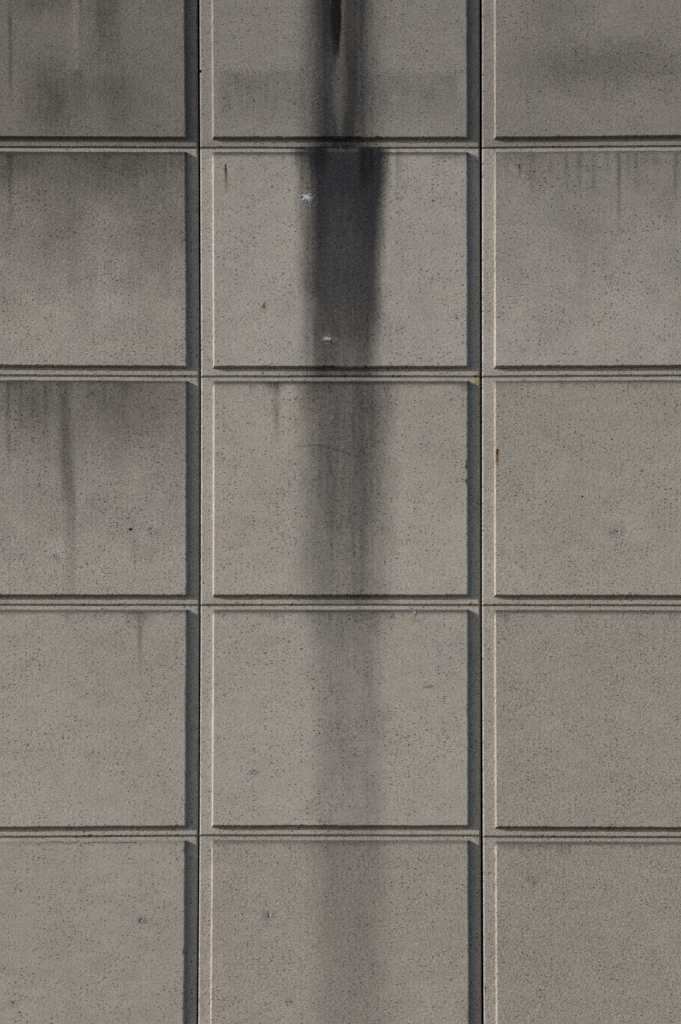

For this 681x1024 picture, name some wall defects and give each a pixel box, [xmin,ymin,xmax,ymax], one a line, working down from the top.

leakage [299,0,385,517]